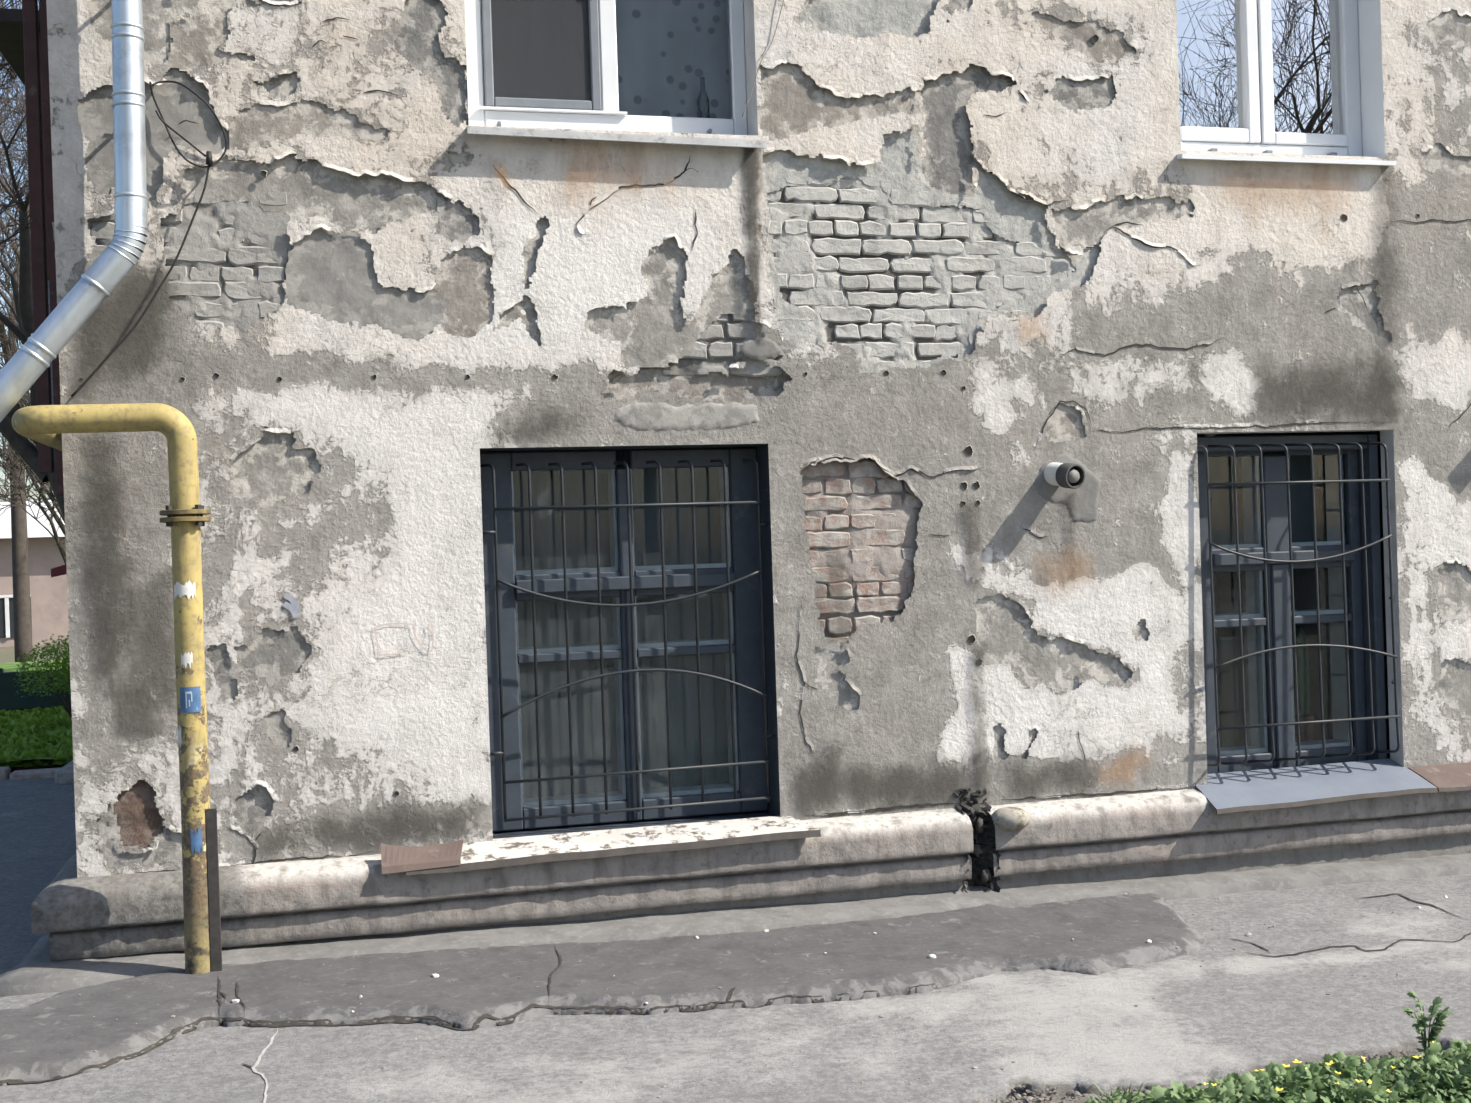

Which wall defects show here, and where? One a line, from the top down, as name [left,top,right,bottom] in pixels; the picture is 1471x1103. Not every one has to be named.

spalling [793,0,973,39]
spalling [77,85,115,258]
flaking render [142,0,550,346]
crack [493,165,536,212]
crack [575,157,698,235]
crack [690,211,698,251]
flaking render [584,58,1195,402]
water stain [87,440,130,671]
flaking render [800,454,923,711]
spalling [967,593,1134,692]
water stain [796,648,988,811]
spalling [96,779,182,869]